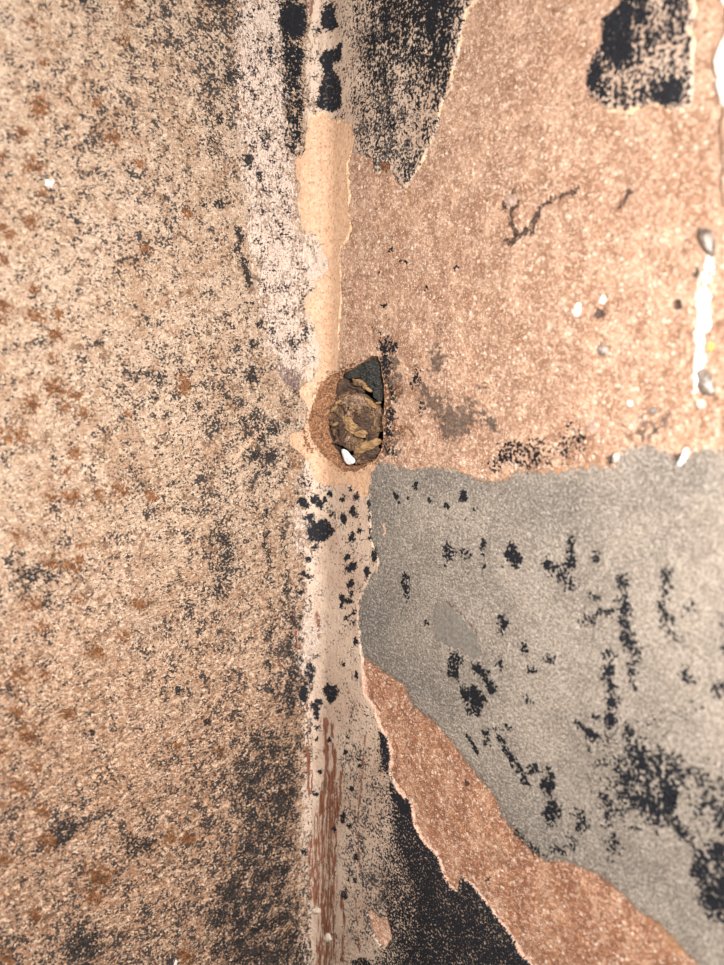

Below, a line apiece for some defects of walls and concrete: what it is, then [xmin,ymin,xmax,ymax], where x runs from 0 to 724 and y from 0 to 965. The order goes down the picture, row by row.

damp [585,0,695,113]
damp [205,0,475,388]
peeling [276,0,724,497]
damp [232,413,285,473]
damp [401,571,412,603]
damp [444,490,479,521]
damp [439,538,524,570]
damp [203,470,379,965]
corrosion [306,717,345,965]
damp [352,729,531,965]
peeling [361,655,700,965]